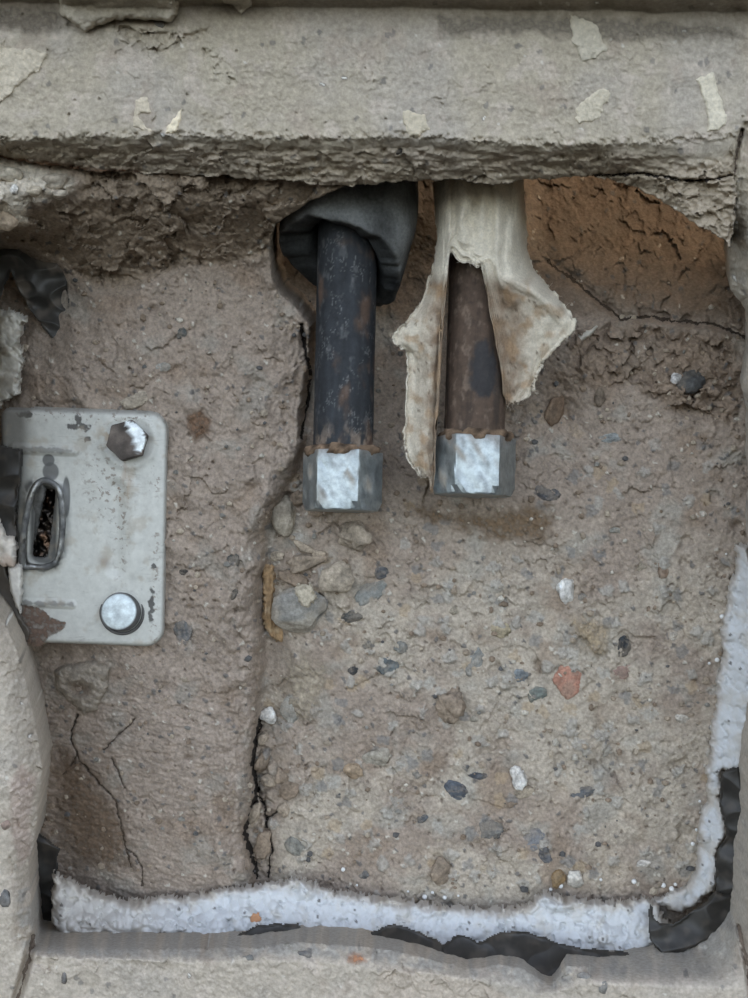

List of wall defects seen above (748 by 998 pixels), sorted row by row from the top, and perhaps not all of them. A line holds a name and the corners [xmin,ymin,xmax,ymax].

crack [592,172,732,183]
rust [438,427,514,442]
crack [62,714,144,886]
crack [242,718,278,879]